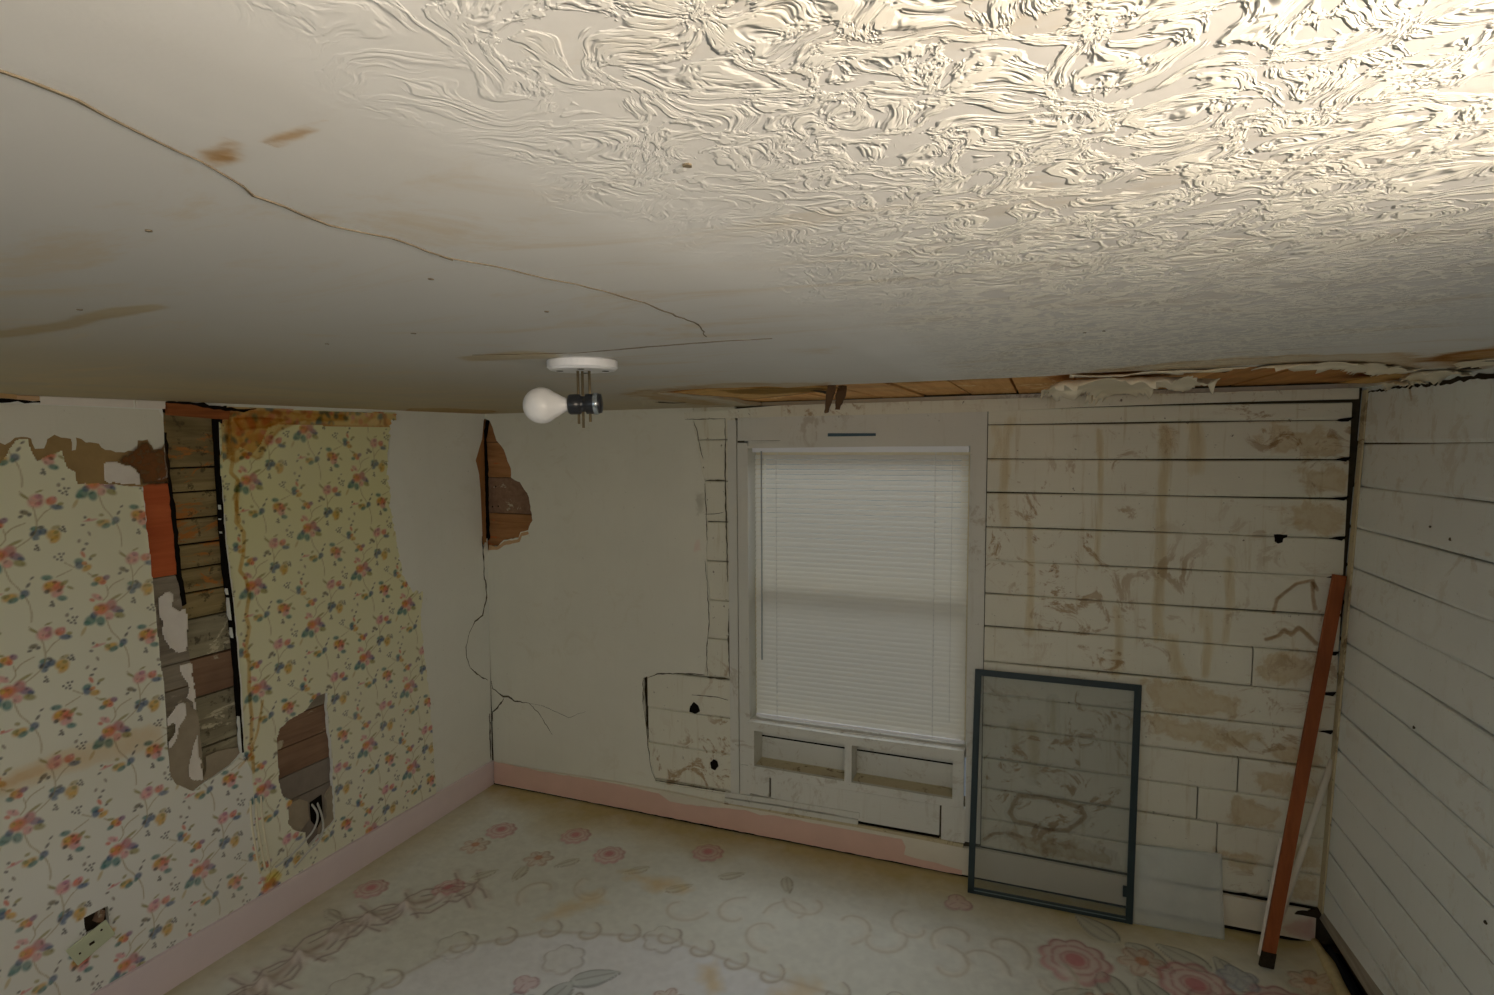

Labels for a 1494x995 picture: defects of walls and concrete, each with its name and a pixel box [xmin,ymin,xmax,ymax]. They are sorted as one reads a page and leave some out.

crack [0,69,772,355]
flaking render [476,419,532,550]
flaking render [104,413,244,791]
crack [466,536,584,758]
flaking render [277,693,334,844]